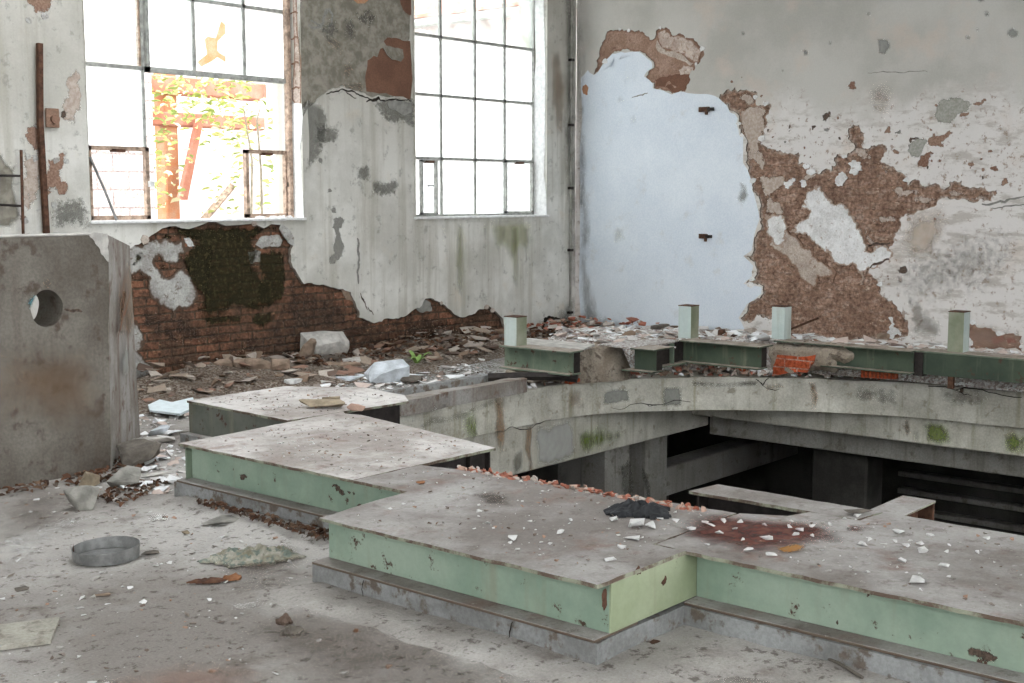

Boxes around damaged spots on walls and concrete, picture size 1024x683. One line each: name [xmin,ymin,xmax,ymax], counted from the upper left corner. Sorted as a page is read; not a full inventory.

spalling [365,37,413,100]
crack [326,88,412,116]
flaking render [25,122,69,208]
peeling [579,26,1008,340]
flaking render [330,207,344,264]
spalling [130,221,504,378]
spalling [969,319,1023,352]
crack [614,400,689,410]